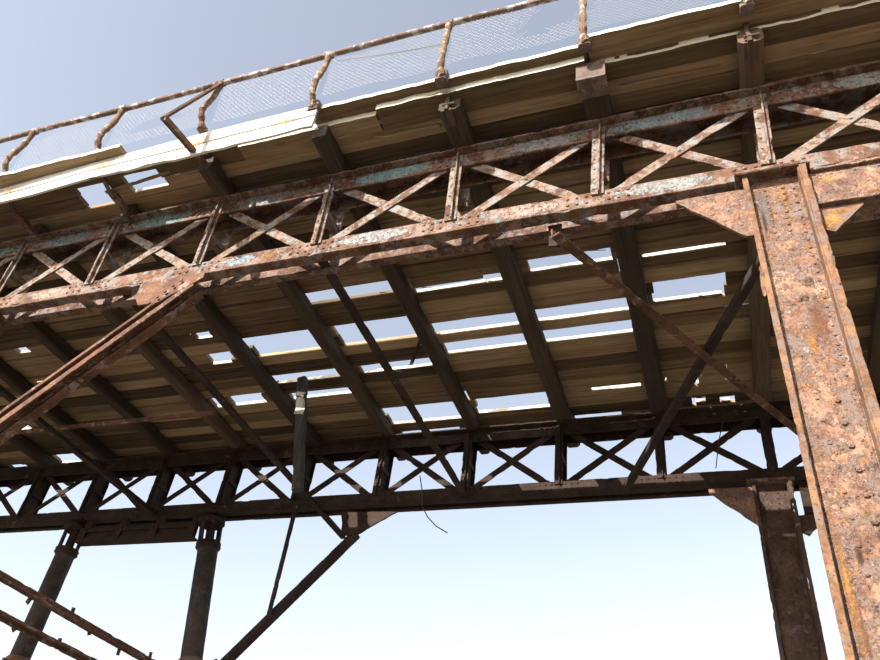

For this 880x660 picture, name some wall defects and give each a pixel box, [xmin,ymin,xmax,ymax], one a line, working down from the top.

peeling [828,71,880,88]
peeling [606,106,715,133]
peeling [505,134,580,153]
peeling [611,174,715,196]
rust [824,209,844,227]
rust [809,310,826,352]
rust [837,545,870,654]